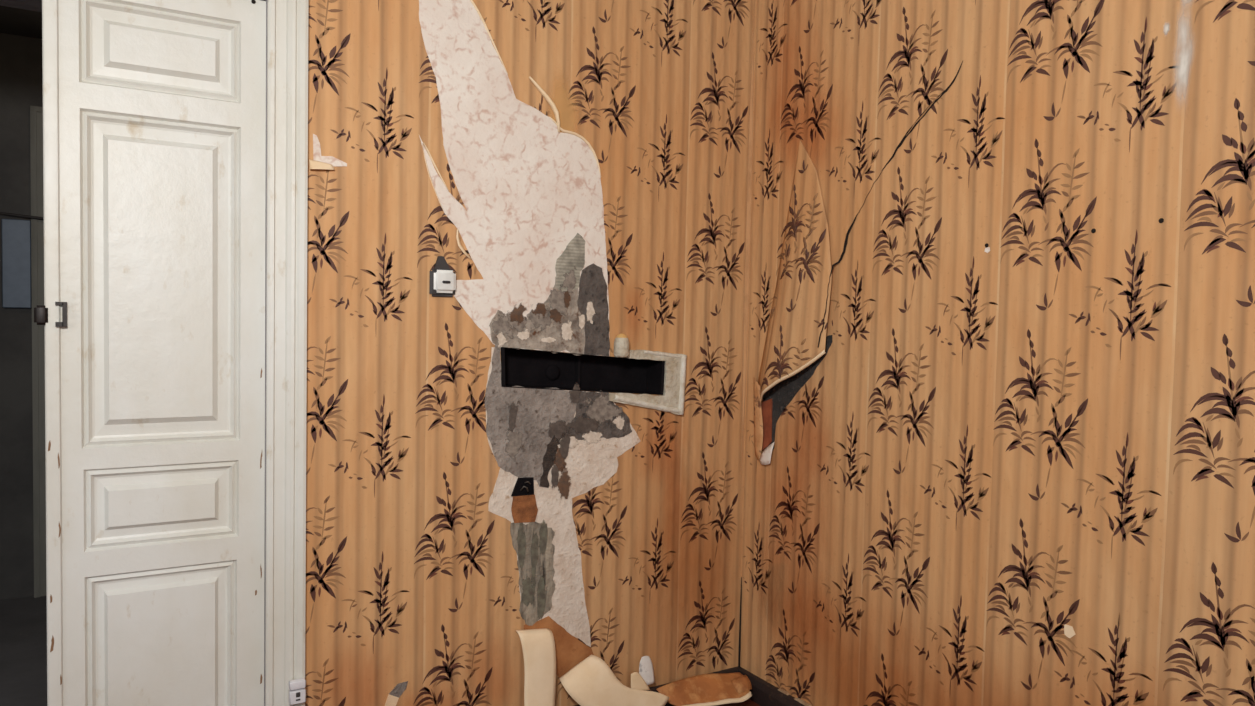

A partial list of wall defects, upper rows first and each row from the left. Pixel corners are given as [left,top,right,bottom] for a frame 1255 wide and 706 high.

crack [818,61,963,348]
spalling [485,263,632,626]
flaking render [762,335,832,451]